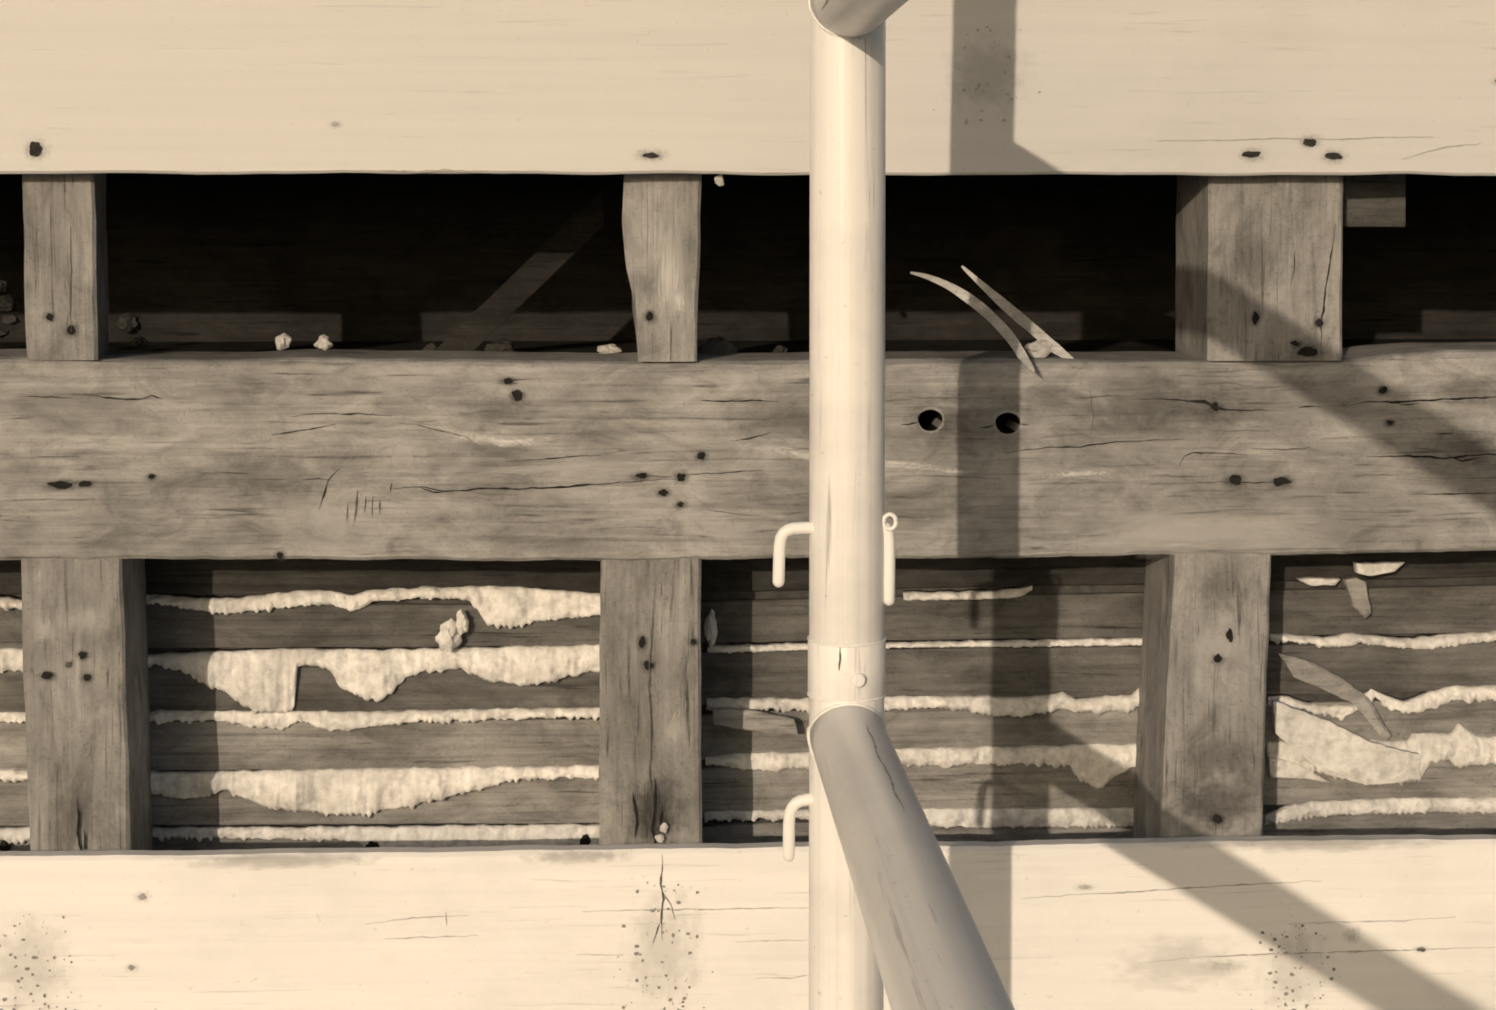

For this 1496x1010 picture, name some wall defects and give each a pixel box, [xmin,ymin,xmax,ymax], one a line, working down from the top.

crack [582,575,809,979]